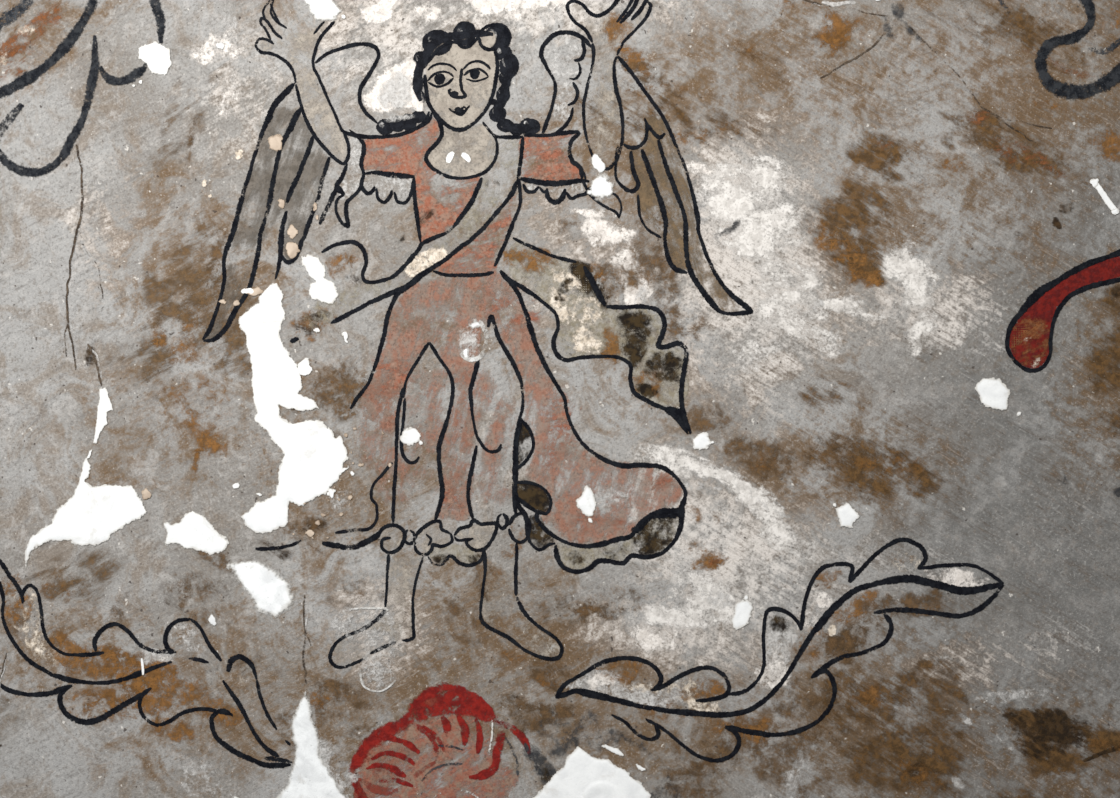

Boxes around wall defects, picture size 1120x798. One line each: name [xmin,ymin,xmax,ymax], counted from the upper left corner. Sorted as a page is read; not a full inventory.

flaking render [132,41,172,87]
flaking render [268,134,283,151]
crack [64,144,103,388]
flaking render [286,225,338,304]
flaking render [219,283,367,539]
flaking render [975,377,1021,416]
flaking render [24,388,151,566]
flaking render [164,511,229,555]
flaking render [227,561,293,617]
flaking render [276,691,357,798]
flaking render [533,744,651,798]